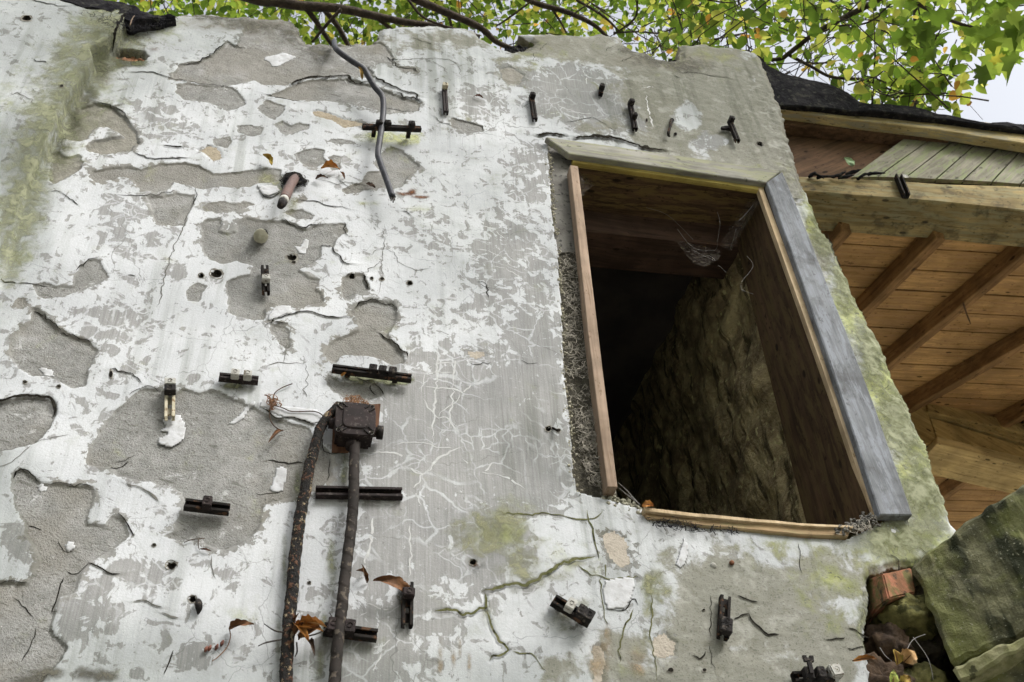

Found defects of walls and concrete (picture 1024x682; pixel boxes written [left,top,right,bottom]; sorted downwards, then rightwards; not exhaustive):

leakage [0,9,147,278]
spalling [173,17,419,170]
crack [537,117,663,150]
spalling [51,105,346,349]
spalling [0,398,54,451]
spalling [11,299,96,388]
spalling [89,389,330,549]
spalling [325,275,403,365]
leakage [813,218,945,562]
spalling [0,472,126,682]
crack [435,511,657,680]